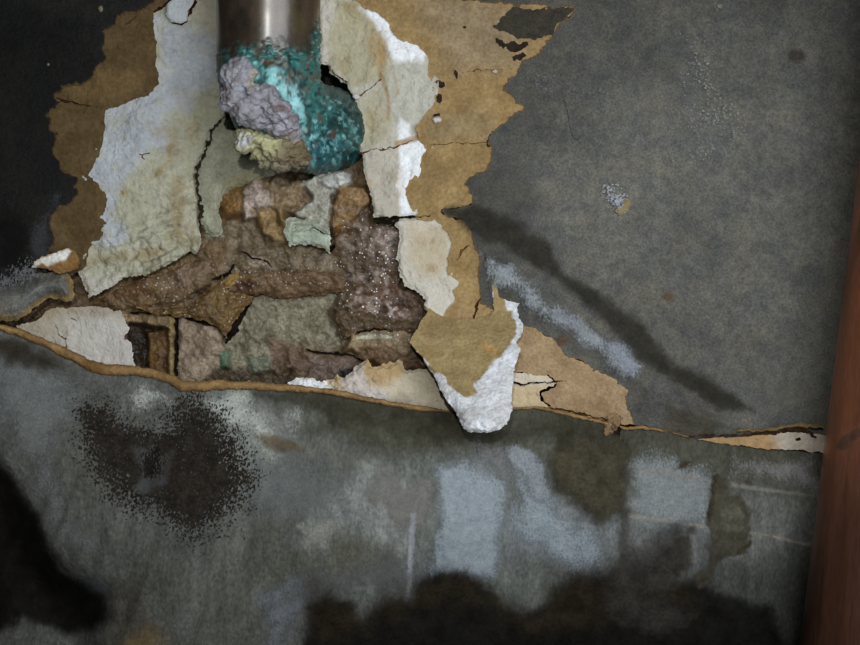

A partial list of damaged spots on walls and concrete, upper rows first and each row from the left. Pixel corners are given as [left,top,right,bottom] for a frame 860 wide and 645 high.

flaking render [0,0,557,433]
water stain [450,206,744,410]
water stain [0,339,782,645]
crack [689,422,824,438]
water stain [737,461,820,497]